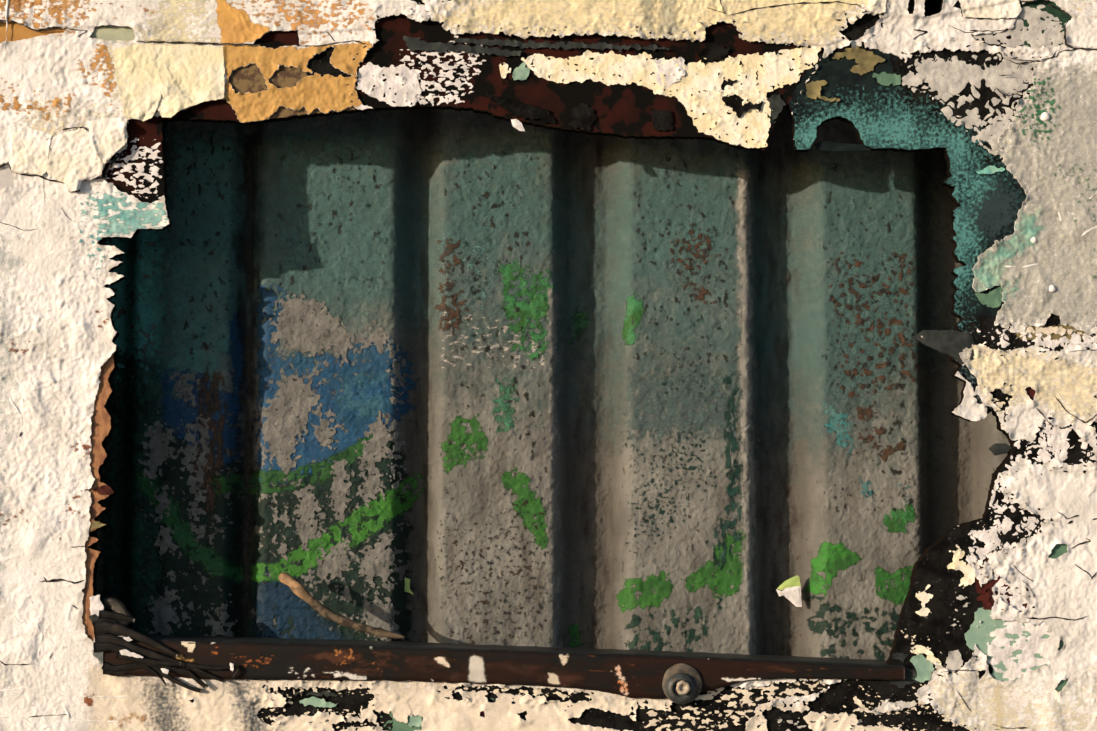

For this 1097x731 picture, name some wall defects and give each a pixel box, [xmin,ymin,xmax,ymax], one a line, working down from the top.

crack [0,20,87,37]
rust [0,0,122,36]
crack [136,39,260,47]
crack [913,0,1097,96]
crack [0,146,128,221]
peeling [0,0,1097,367]
peeling [256,147,414,641]
peeling [81,353,114,641]
peeling [138,371,218,560]
peeling [438,357,1097,731]
rust [312,649,469,681]
rust [484,661,586,687]